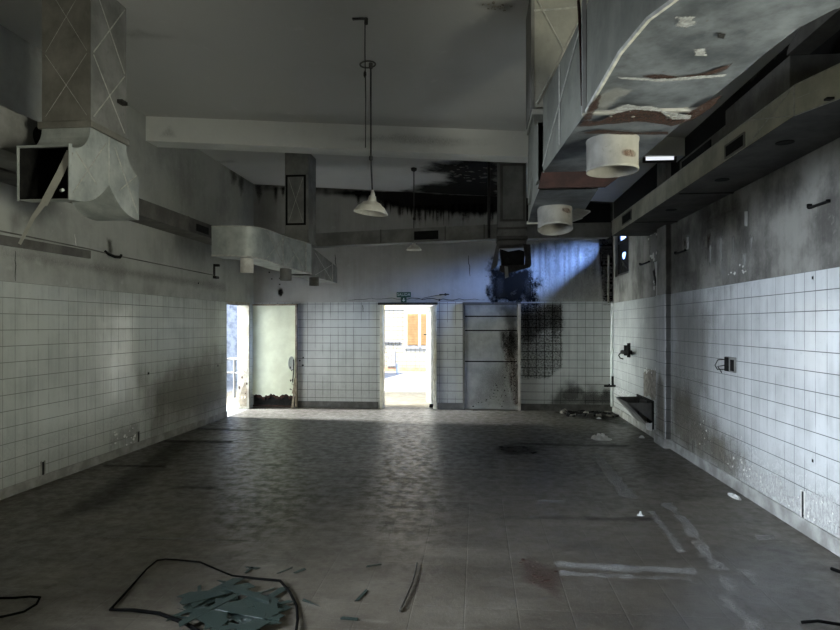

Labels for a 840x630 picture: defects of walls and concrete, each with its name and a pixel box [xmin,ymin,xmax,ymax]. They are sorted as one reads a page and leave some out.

peeling [675,16,695,28]
corrosion [618,64,731,82]
corrosion [578,95,722,135]
leakage [379,201,493,221]
leakage [486,257,562,378]
leakage [657,224,838,533]